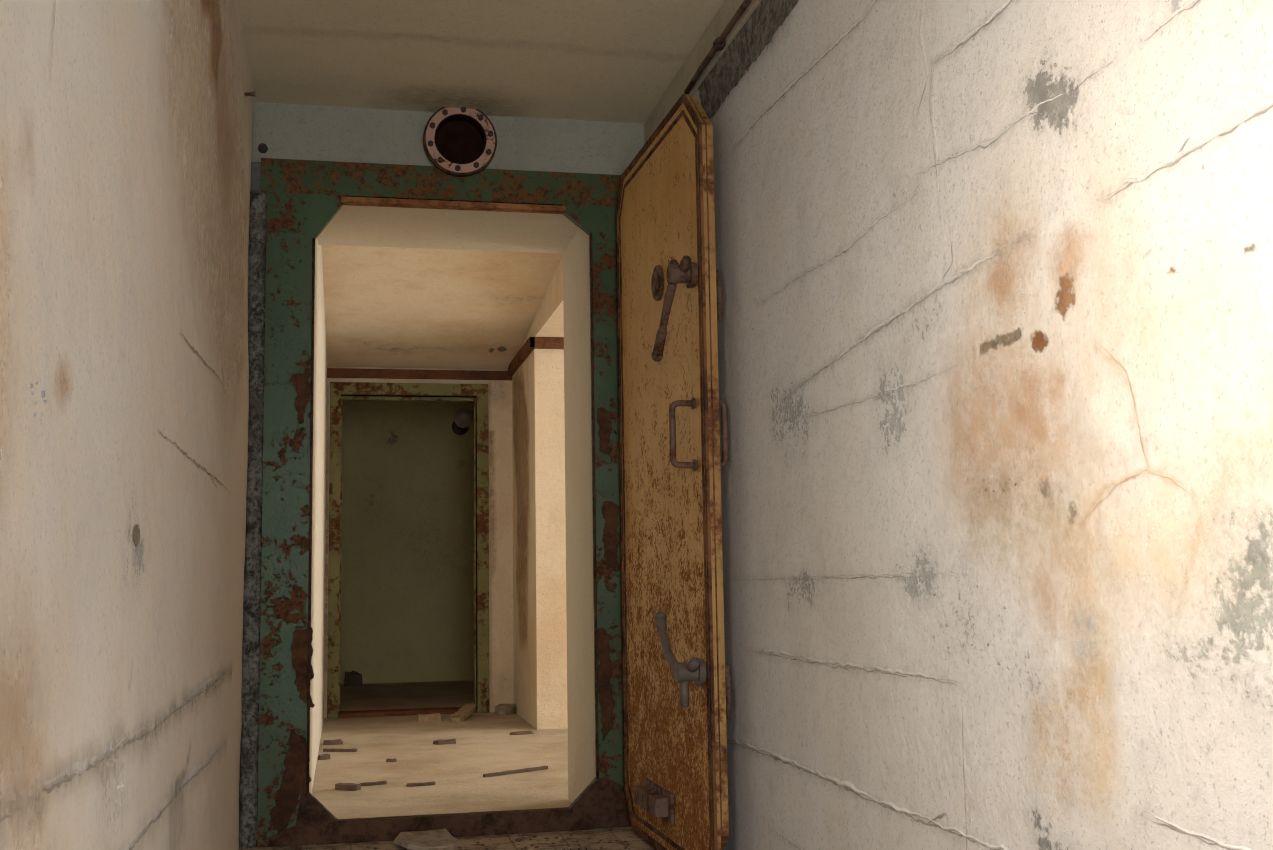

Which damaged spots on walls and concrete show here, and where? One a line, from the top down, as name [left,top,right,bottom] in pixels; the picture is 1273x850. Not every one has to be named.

crack [917,0,1013,114]
crack [757,60,1112,304]
crack [1103,97,1273,200]
rust [1055,240,1076,317]
rust [1031,331,1048,352]
peeling [295,368,311,424]
peeling [291,627,315,708]
peeling [597,628,615,741]
peeling [270,731,311,833]
crack [729,648,1009,850]
peeling [1031,810,1068,850]
crack [1141,810,1252,850]